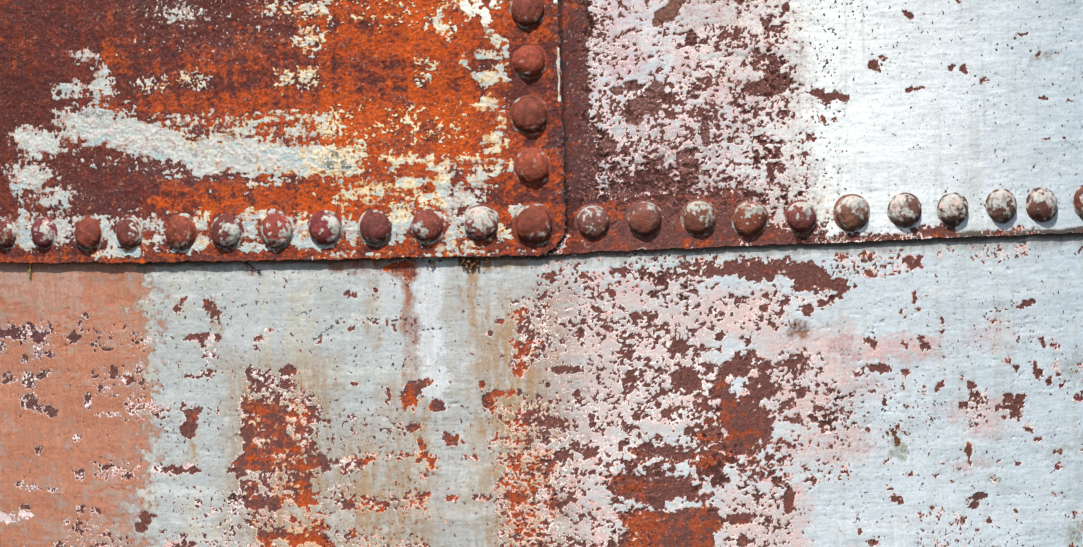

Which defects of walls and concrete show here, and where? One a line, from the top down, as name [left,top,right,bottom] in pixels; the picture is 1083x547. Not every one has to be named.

corrosion [347,257,417,344]
peeling [0,0,850,547]
corrosion [0,312,173,423]
peeling [1003,335,1083,402]
corrosion [16,480,63,493]
corrosion [52,504,133,547]
corrosion [74,460,140,481]
corrosion [158,362,431,547]
corrosion [444,296,565,547]
corrosion [589,322,871,547]
peeling [885,459,1002,547]
peeling [1050,448,1064,473]